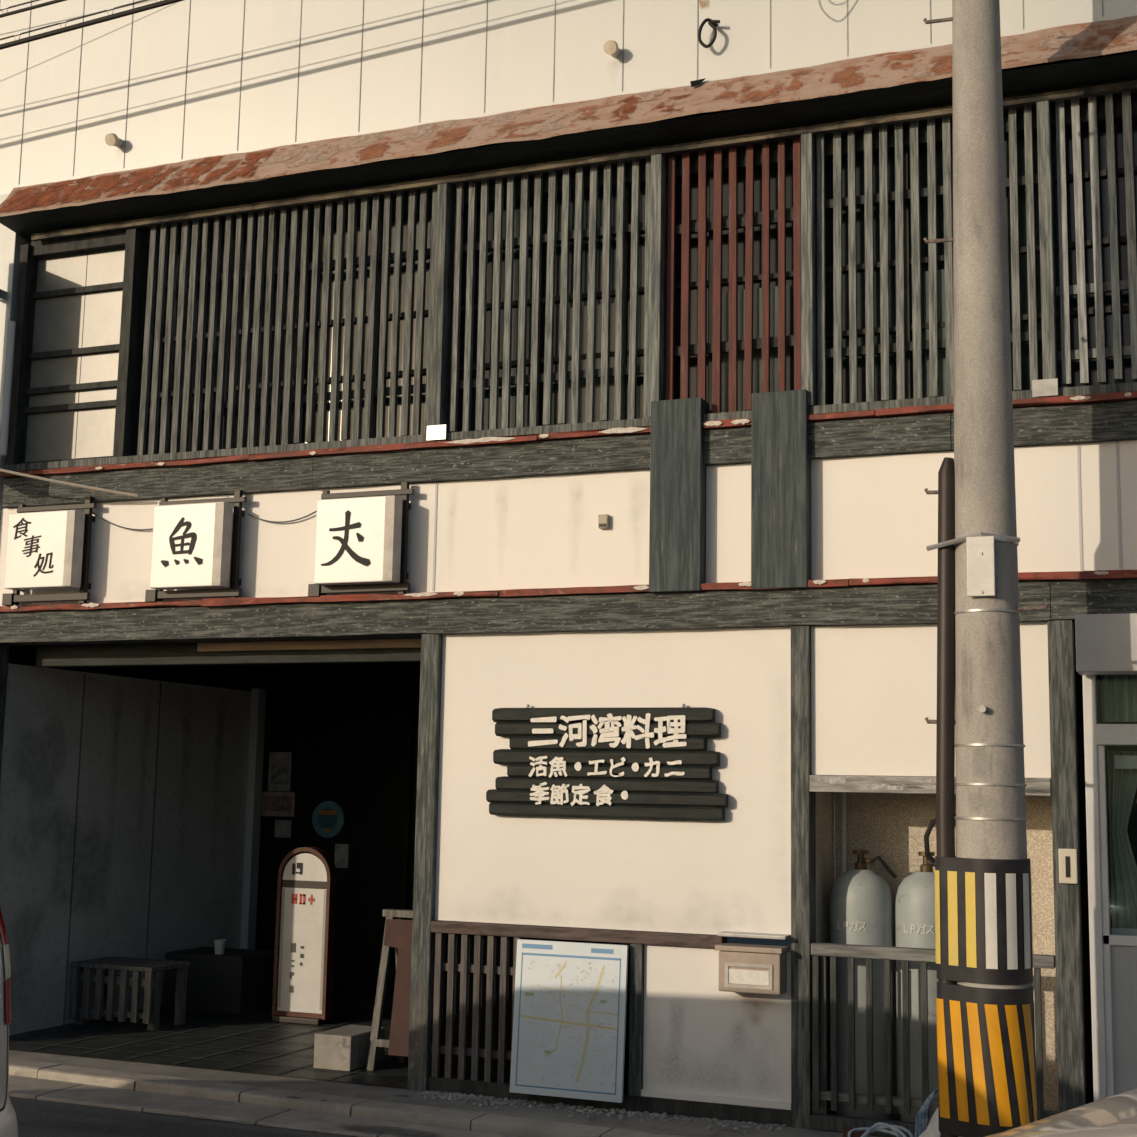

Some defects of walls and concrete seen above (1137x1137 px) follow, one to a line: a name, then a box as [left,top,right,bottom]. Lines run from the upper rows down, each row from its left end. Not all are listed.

rust [1076,26,1122,49]
rust [885,52,918,69]
rust [930,55,952,74]
rust [716,69,812,102]
rust [832,66,864,87]
rust [611,96,641,122]
rust [426,126,473,148]
rust [492,120,541,139]
rust [356,141,397,160]
rust [0,149,273,212]